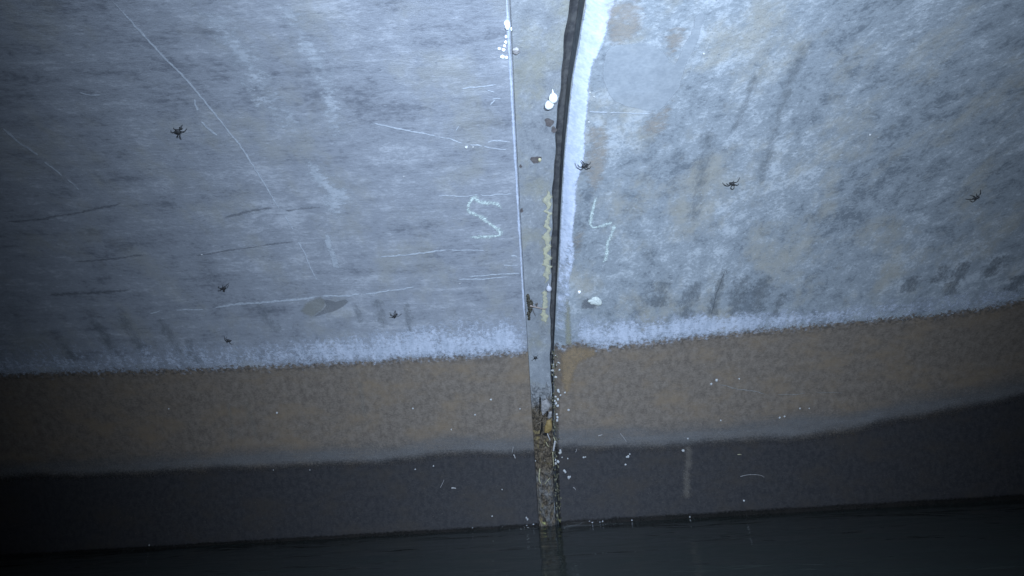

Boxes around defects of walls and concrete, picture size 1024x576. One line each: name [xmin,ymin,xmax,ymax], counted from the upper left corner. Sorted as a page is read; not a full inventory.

leakage [0,0,539,556]